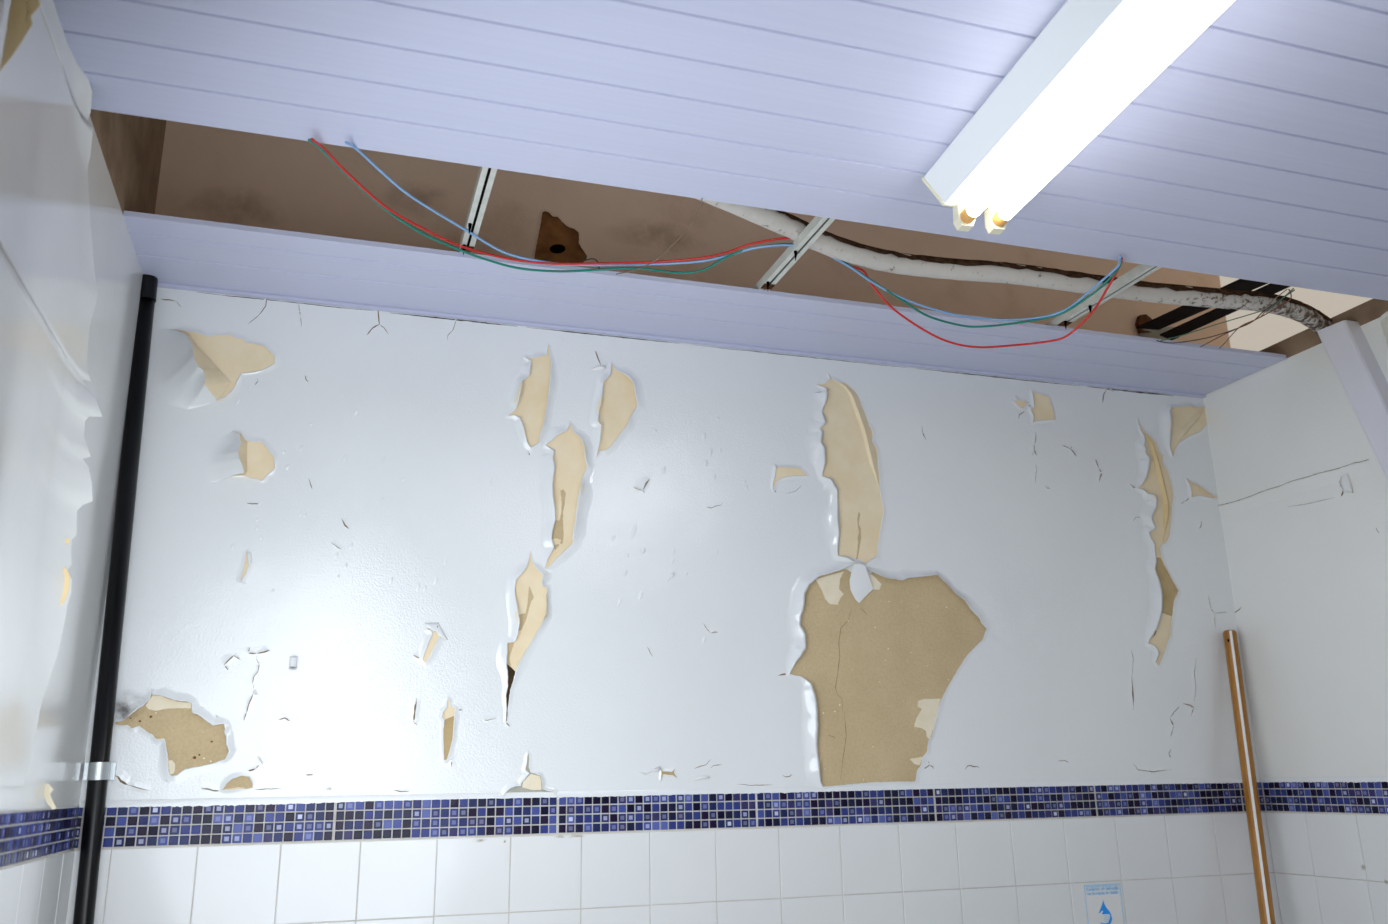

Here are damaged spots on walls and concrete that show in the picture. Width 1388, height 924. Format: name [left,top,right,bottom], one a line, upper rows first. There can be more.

peeling [0,0,102,786]
peeling [153,327,282,410]
peeling [201,430,281,485]
peeling [236,548,254,584]
peeling [496,342,647,723]
peeling [769,372,991,789]
peeling [1134,401,1218,670]
peeling [113,687,263,795]
peeling [437,694,460,764]
peeling [44,783,56,810]